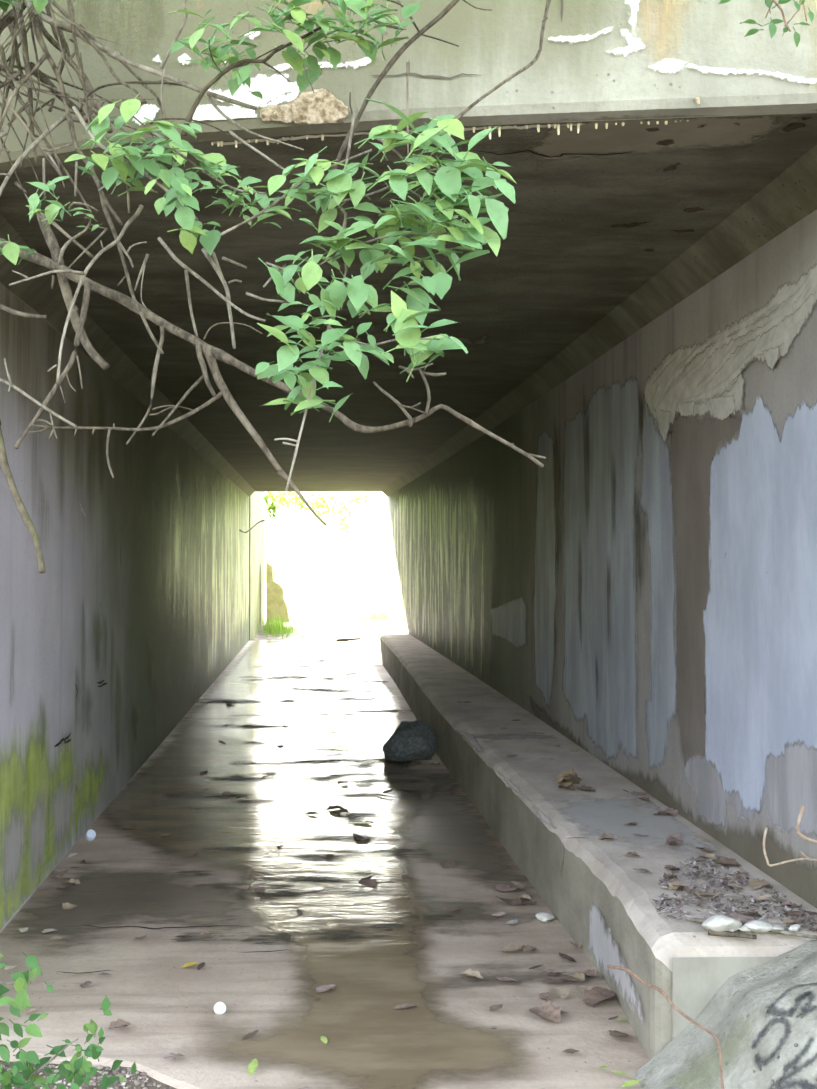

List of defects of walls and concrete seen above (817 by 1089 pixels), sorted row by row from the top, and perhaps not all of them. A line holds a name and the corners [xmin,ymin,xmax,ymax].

crack [473,150,634,158]
peeling [490,265,817,835]